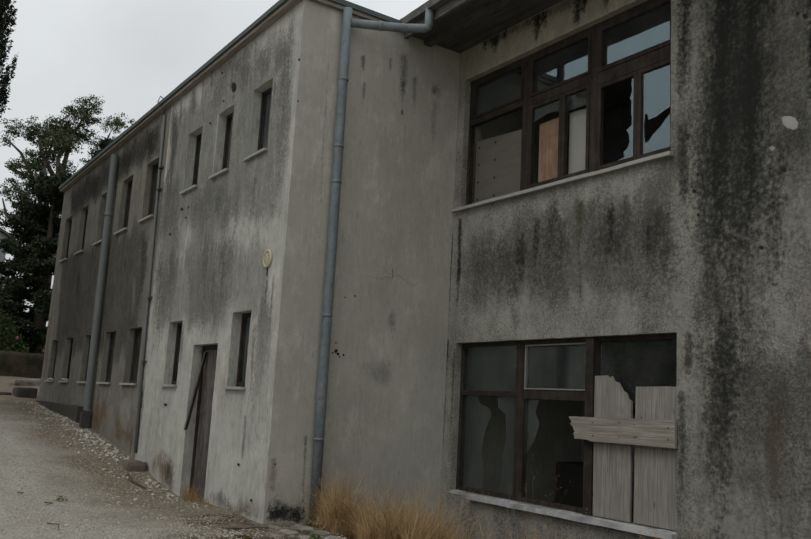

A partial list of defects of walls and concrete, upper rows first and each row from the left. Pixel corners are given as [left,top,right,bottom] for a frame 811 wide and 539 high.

spalling [782,116,798,130]
damp [71,128,159,213]
damp [677,0,774,439]
damp [267,503,304,522]